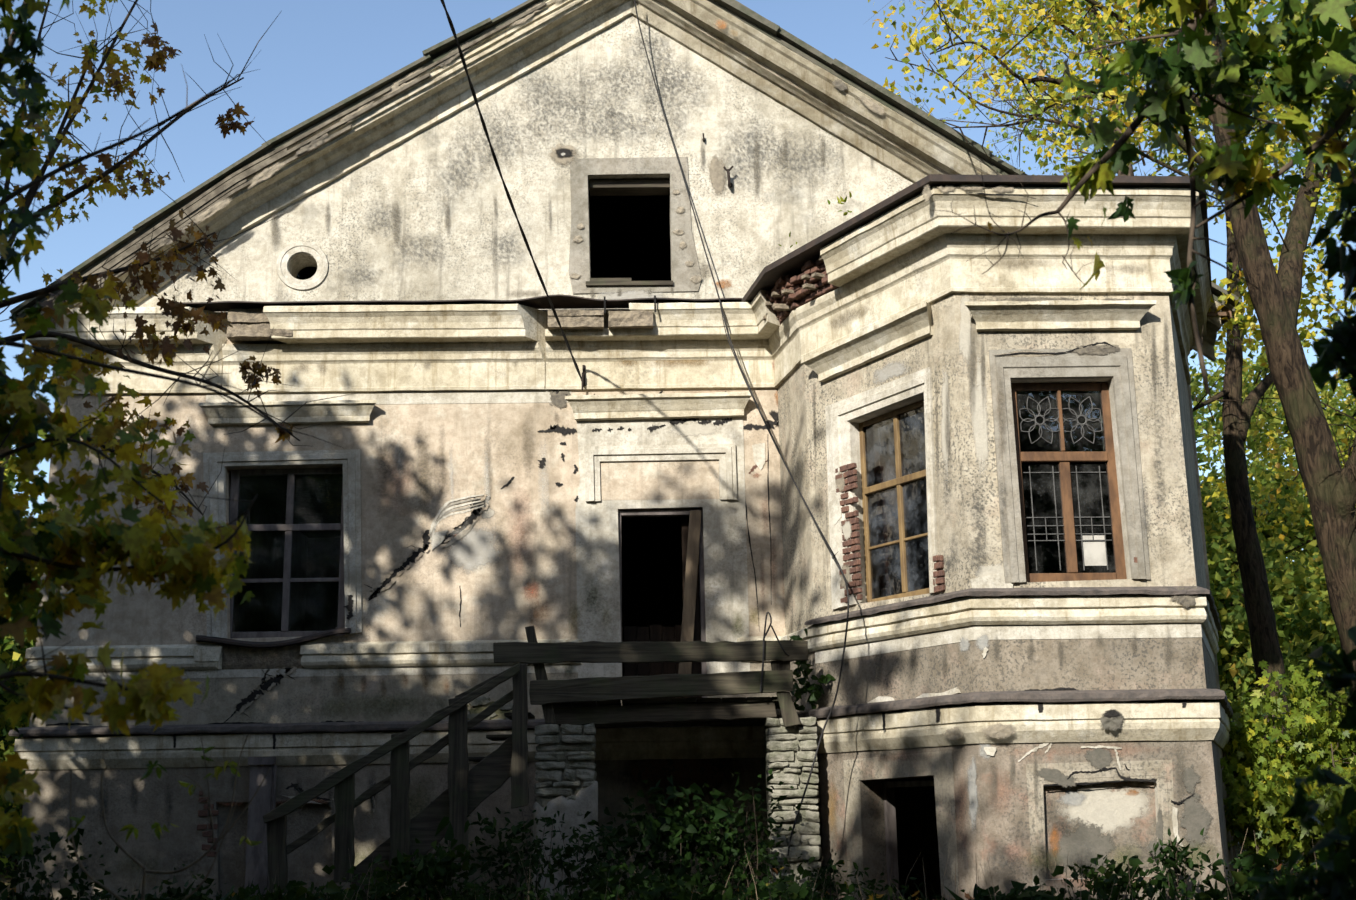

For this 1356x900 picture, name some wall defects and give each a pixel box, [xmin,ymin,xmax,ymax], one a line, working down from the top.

water stain [534,84,578,119]
water stain [735,132,759,190]
water stain [446,161,475,231]
water stain [374,207,436,258]
flaking render [763,256,839,325]
spalling [538,411,779,487]
crack [343,477,514,619]
flaking render [828,463,863,603]
peeling [970,564,1014,588]
crack [46,720,92,728]
crack [209,667,297,724]
peeling [1018,742,1213,876]